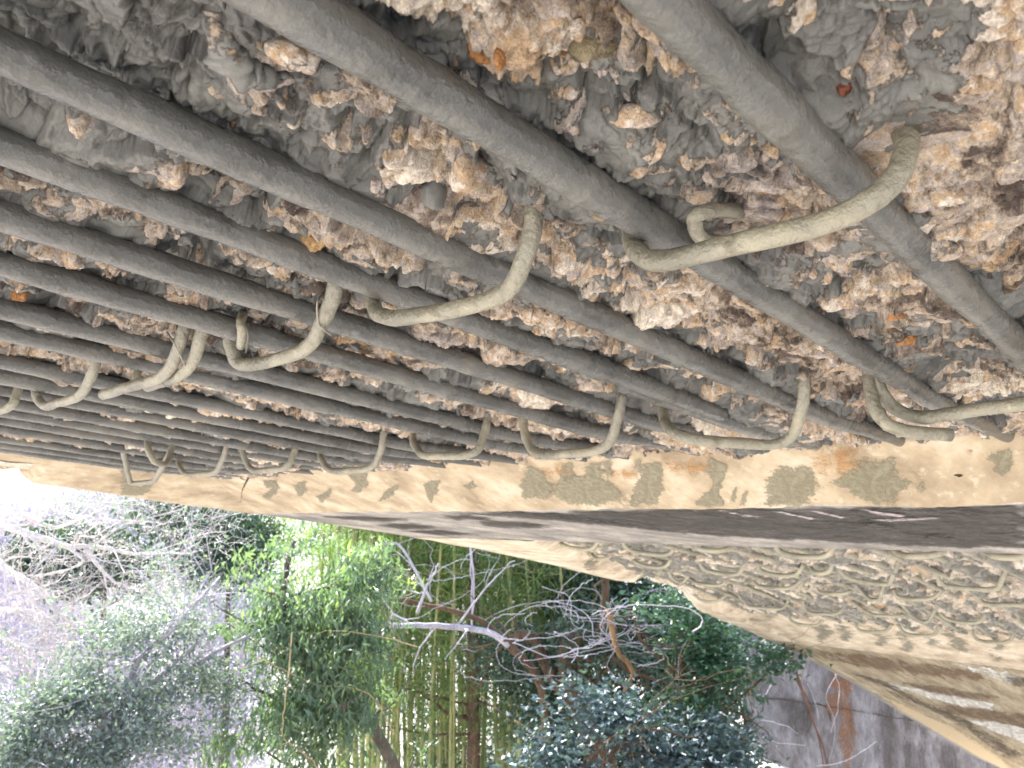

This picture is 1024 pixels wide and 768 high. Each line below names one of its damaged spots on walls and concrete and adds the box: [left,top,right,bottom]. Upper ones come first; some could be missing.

spalling [0,0,1024,480]
spalling [567,542,1024,641]